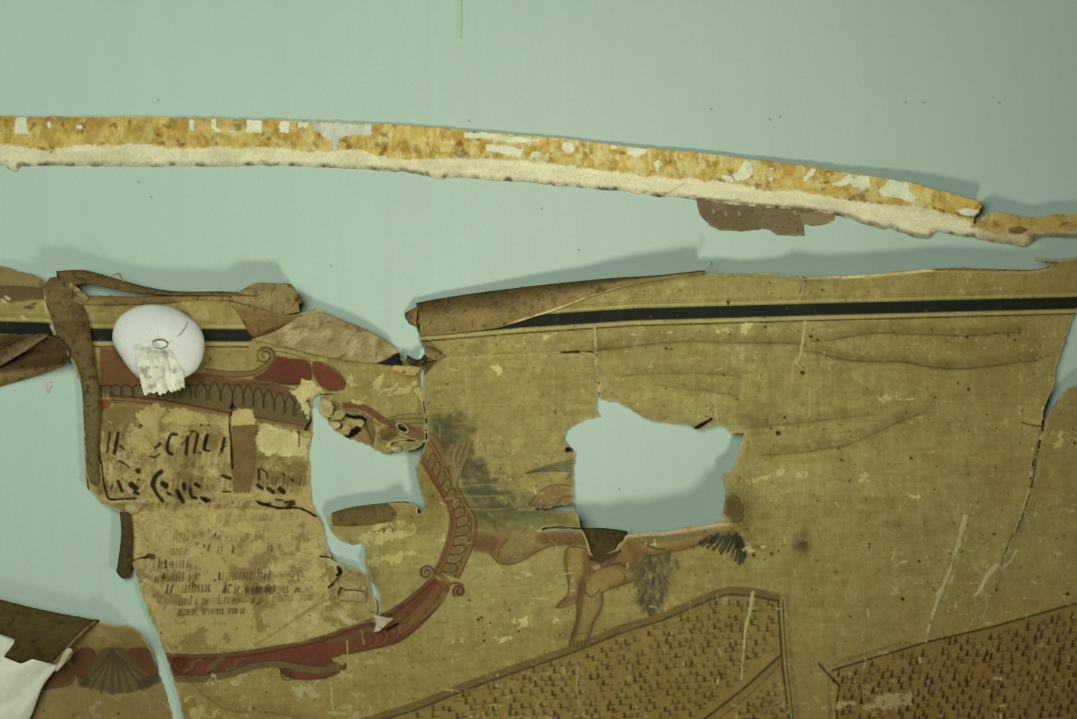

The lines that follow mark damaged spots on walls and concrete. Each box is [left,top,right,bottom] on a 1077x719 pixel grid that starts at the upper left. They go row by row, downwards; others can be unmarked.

peeling [14,117,29,135]
peeling [211,119,263,133]
peeling [278,121,372,151]
peeling [464,132,541,158]
peeling [562,142,574,153]
peeling [610,145,660,171]
peeling [721,160,753,183]
peeling [832,174,916,203]
peeling [958,208,979,216]
peeling [131,508,263,565]
peeling [358,520,417,567]
peeling [278,530,333,615]